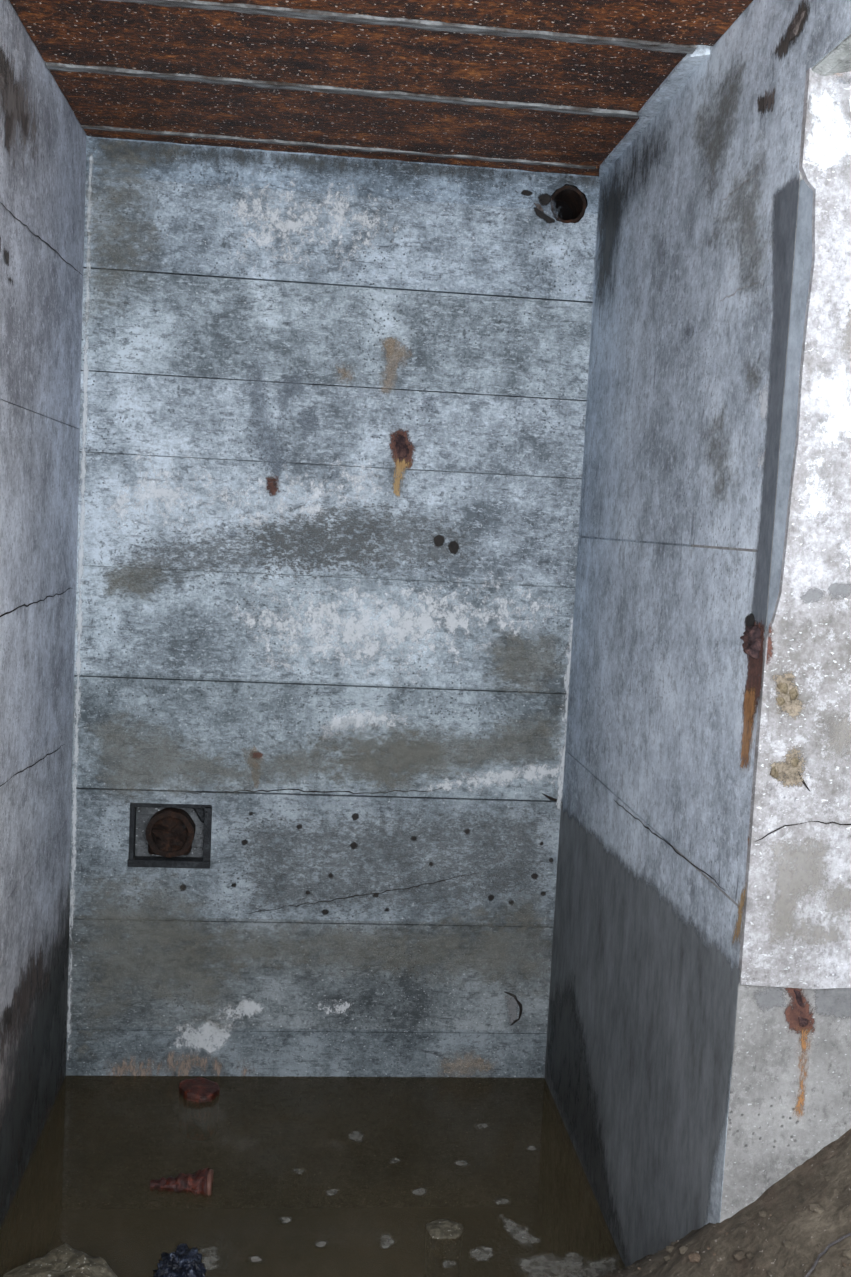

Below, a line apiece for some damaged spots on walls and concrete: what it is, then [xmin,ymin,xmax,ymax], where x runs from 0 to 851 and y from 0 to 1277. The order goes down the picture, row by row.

damp [0,47,42,166]
damp [237,189,387,262]
spalling [521,190,555,223]
rust [266,476,280,496]
rust [389,427,415,496]
damp [98,456,559,690]
rust [740,614,773,768]
crack [755,821,851,842]
damp [0,890,82,1236]
rust [784,988,815,1116]